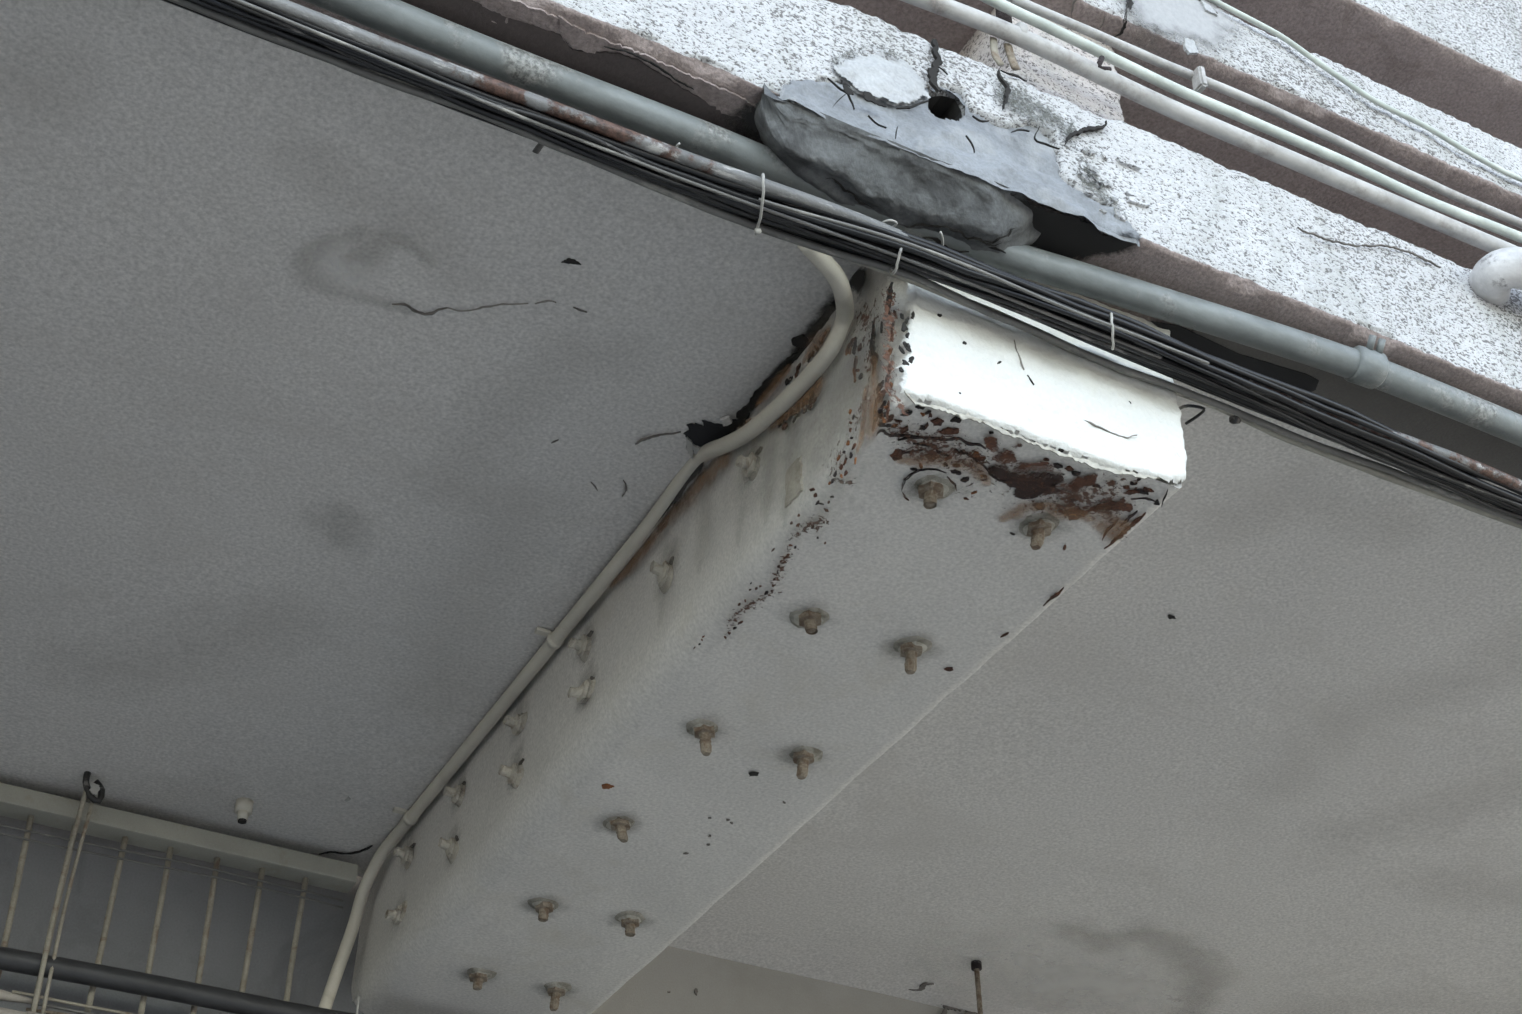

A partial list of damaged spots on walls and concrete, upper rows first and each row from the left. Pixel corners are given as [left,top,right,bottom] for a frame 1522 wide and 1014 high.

peeling [1132,0,1239,55]
spalling [401,0,1150,254]
crack [392,300,587,316]
corrosion [724,282,915,639]
corrosion [979,428,1168,549]